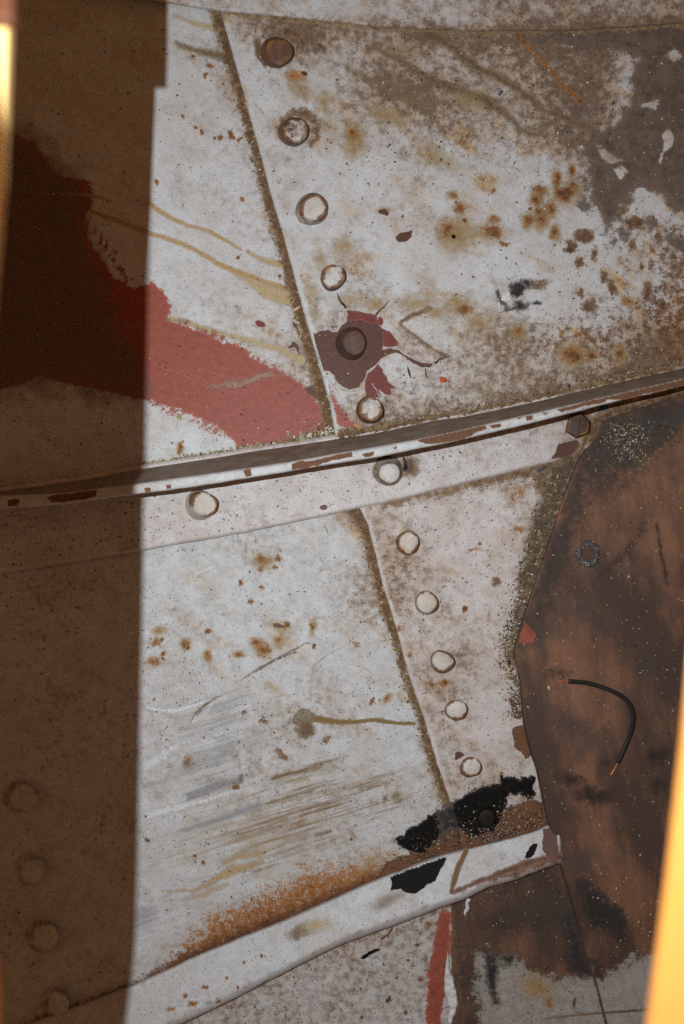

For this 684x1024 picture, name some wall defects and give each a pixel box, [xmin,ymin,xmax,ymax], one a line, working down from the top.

rust [438,192,467,239]
rust [479,214,508,247]
peeling [292,446,419,476]
peeling [47,490,97,503]
rust [255,554,282,572]
rust [145,627,166,666]
rust [233,621,291,658]
rust [76,799,563,1005]